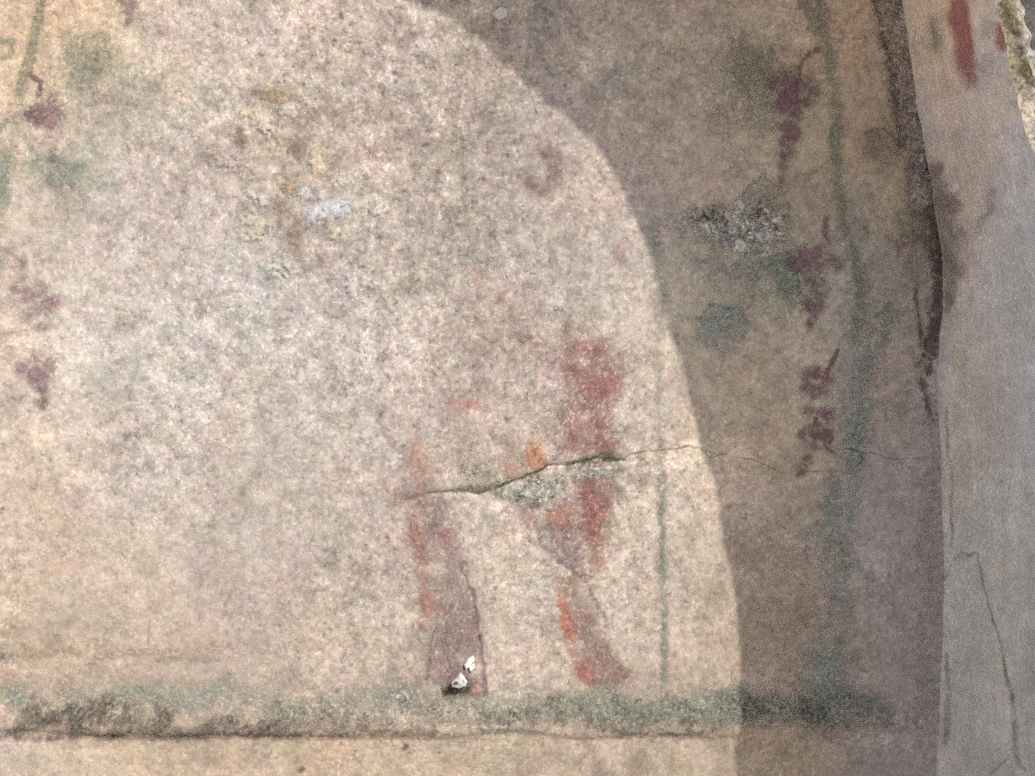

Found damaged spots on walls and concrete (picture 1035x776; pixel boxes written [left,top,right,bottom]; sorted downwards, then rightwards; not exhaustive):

spalling [681,199,790,257]
crack [442,445,769,494]